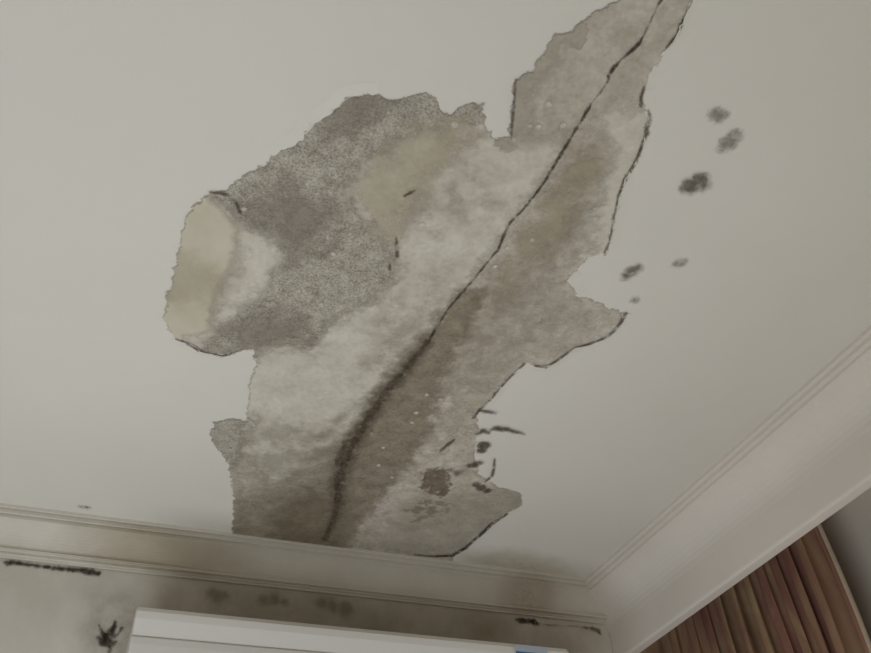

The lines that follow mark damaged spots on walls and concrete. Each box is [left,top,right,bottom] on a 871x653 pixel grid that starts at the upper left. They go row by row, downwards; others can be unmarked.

flaking render [162,0,707,561]
crack [322,27,648,540]
leakage [473,459,495,493]
leakage [455,427,522,476]
leakage [4,560,101,576]